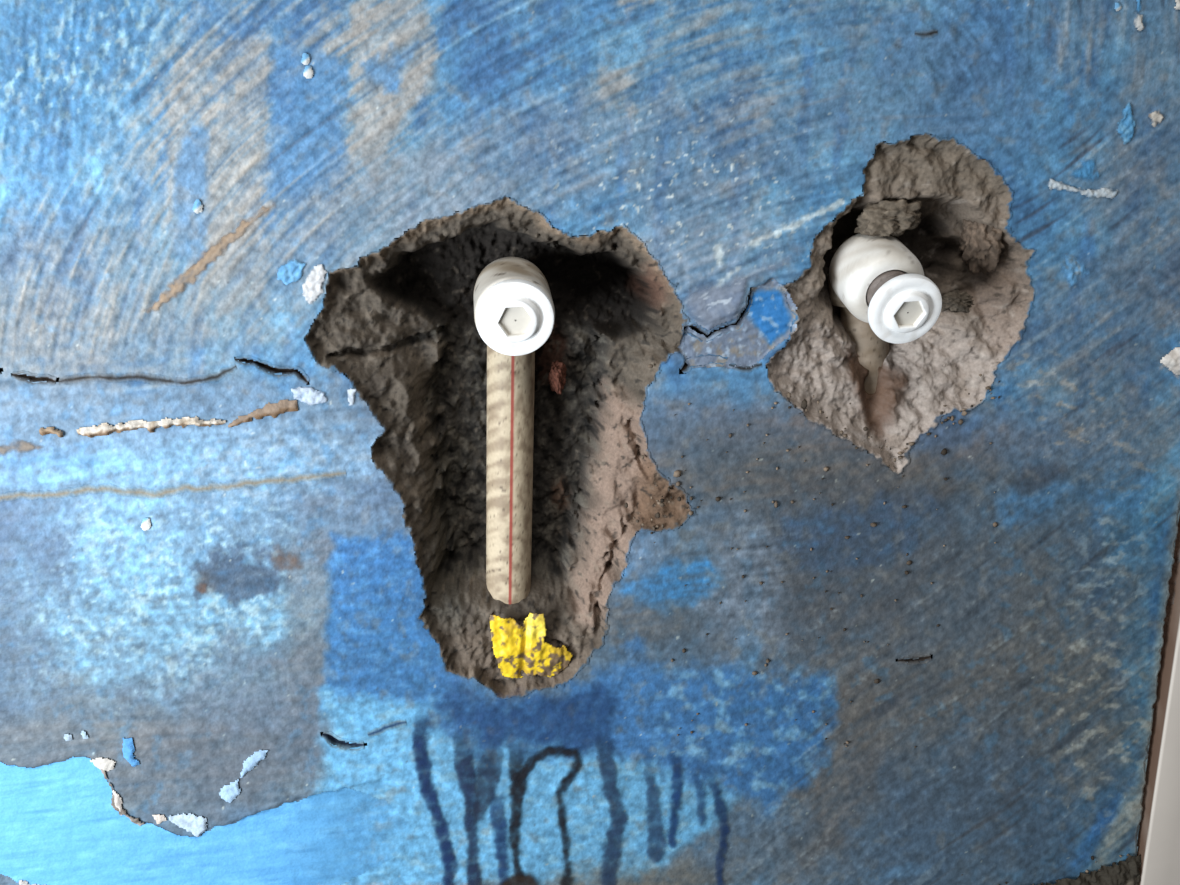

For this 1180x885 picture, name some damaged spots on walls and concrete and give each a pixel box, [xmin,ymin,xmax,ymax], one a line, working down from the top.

peeling [1134,0,1144,31]
peeling [1117,103,1136,144]
peeling [1148,111,1164,127]
crack [0,355,310,387]
spalling [277,133,1036,700]
crack [679,291,762,374]
peeling [1160,347,1180,375]
peeling [0,738,362,885]
leakage [412,727,582,885]
leakage [598,750,627,885]
leakage [646,766,682,862]
leakage [697,782,729,885]